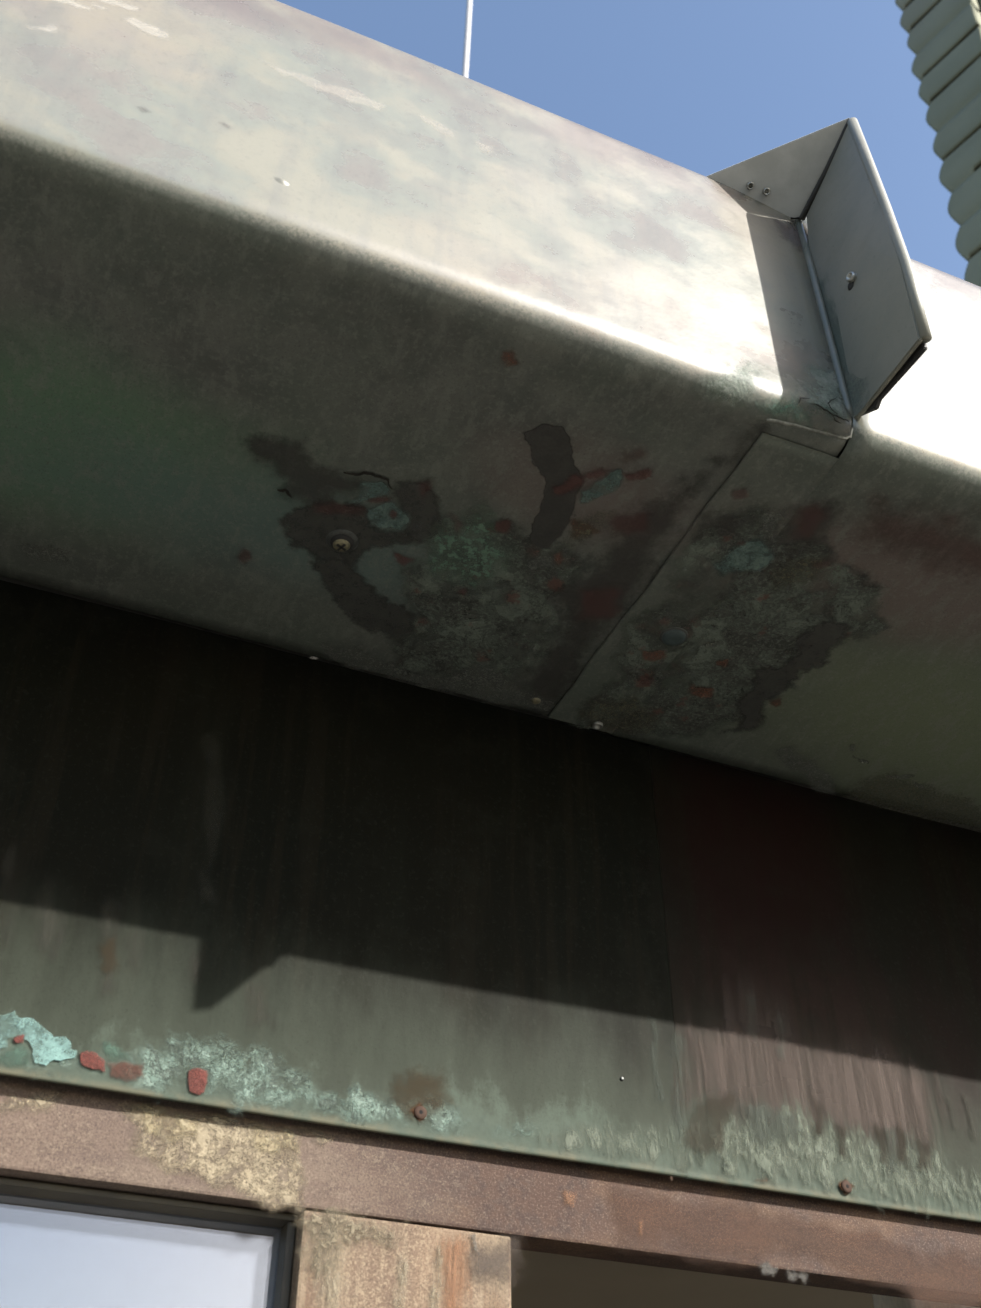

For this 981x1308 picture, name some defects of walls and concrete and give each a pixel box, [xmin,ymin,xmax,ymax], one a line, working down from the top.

peeling [249,437,444,640]
peeling [524,424,609,549]
peeling [0,1016,142,1079]
damp [127,1039,460,1131]
damp [549,994,981,1211]